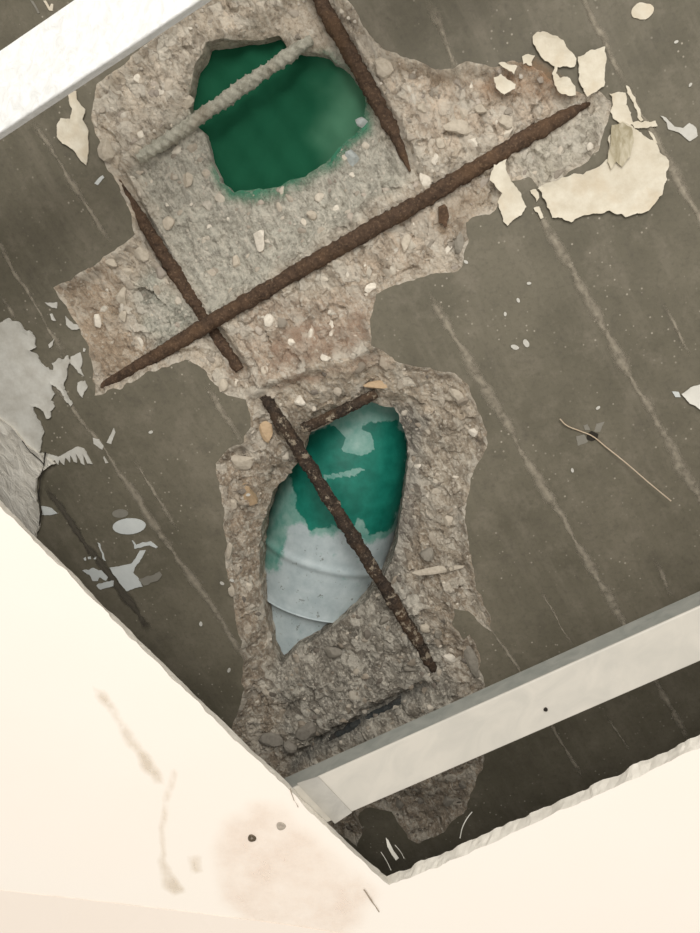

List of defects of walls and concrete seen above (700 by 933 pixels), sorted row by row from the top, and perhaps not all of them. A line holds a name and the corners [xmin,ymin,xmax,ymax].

corrosion [438,204,449,228]
spalling [0,0,669,778]
spalling [327,754,484,846]